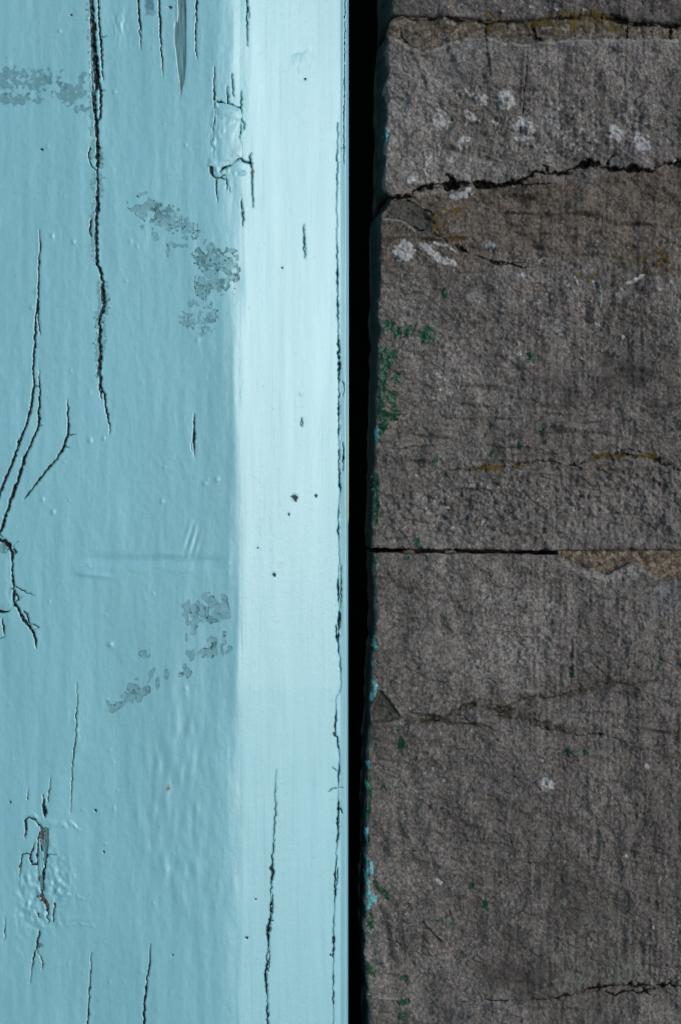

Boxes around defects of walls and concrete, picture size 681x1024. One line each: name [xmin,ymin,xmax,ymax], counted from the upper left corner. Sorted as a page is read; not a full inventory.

crack [88,0,111,434]
peeling [169,0,186,95]
peeling [127,193,240,337]
crack [195,0,253,224]
crack [378,16,681,268]
crack [0,233,75,649]
crack [329,0,346,1023]
peeling [109,592,232,713]
crack [19,691,78,975]
crack [264,779,276,1024]
crack [459,981,680,1003]